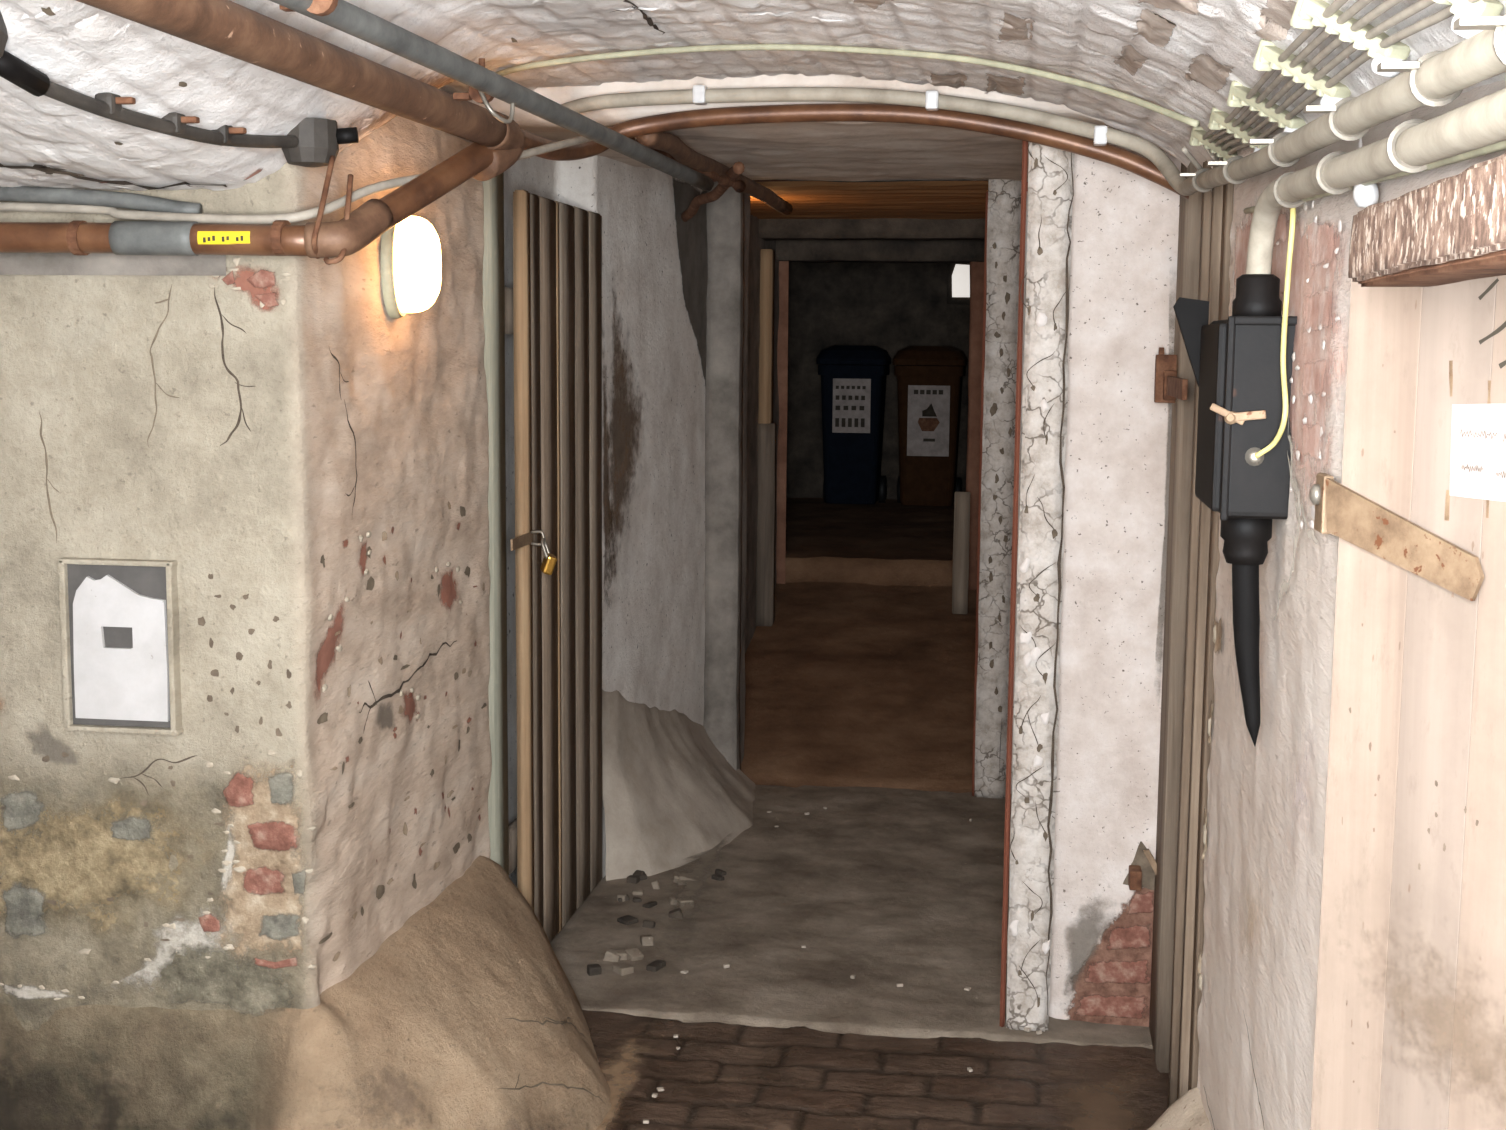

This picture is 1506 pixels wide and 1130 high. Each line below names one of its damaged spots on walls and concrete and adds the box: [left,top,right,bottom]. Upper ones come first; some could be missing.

crack [612,0,665,35]
peeling [927,73,1025,95]
peeling [1109,0,1199,75]
peeling [1245,0,1296,42]
crack [147,285,179,447]
crack [214,285,255,446]
leakage [603,302,641,580]
peeling [1271,200,1343,529]
peeling [990,143,1074,1015]
crack [359,641,456,730]
flaking render [0,717,340,969]
flaking render [1067,841,1155,1027]